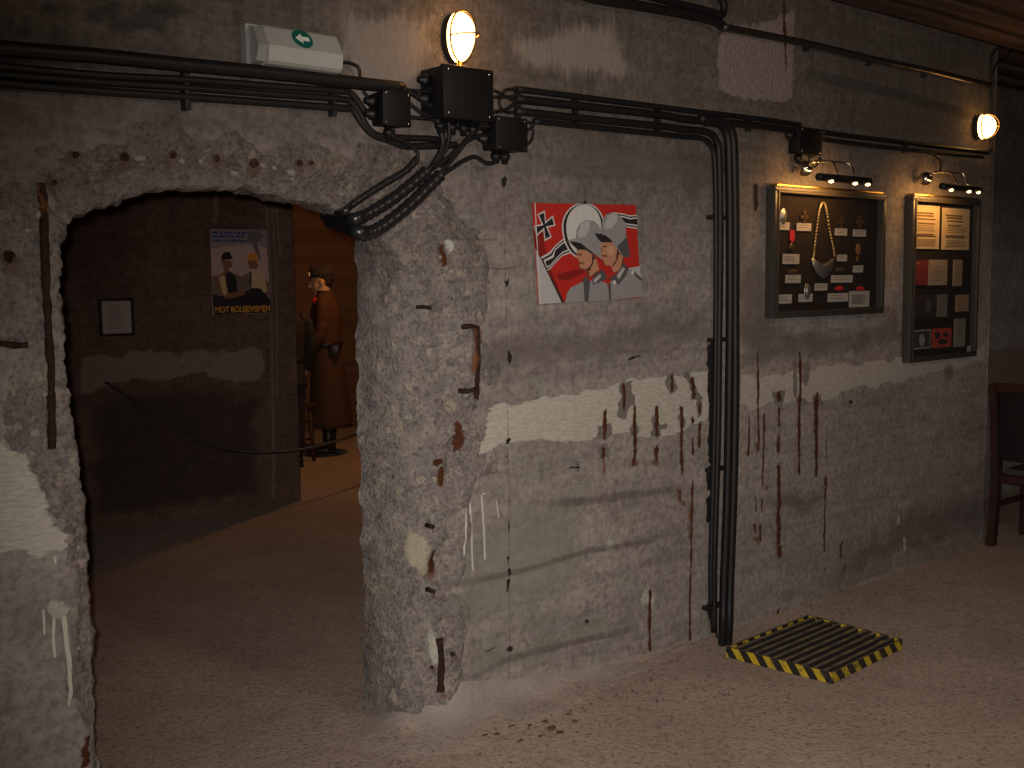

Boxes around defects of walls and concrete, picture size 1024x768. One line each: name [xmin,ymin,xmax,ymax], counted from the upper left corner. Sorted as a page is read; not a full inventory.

rust [37,183,57,449]
rust [458,324,481,399]
peeling [740,345,1024,411]
spalling [0,120,709,768]
rust [433,459,445,486]
rust [451,421,465,452]
leakage [463,493,566,606]
rust [597,371,703,641]
rust [747,352,827,557]
leakage [42,609,73,707]
rust [435,638,445,692]